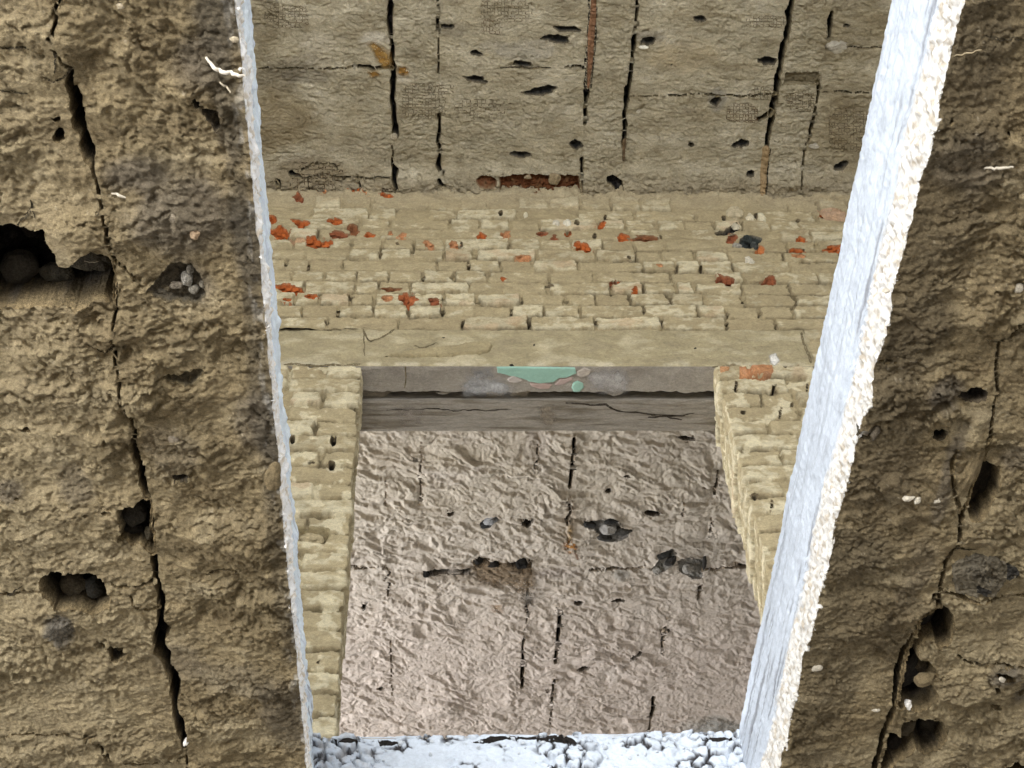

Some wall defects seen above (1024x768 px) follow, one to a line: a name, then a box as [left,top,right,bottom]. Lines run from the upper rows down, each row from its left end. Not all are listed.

spalling [474,172,582,193]
spalling [146,262,206,304]
crack [0,0,189,768]
crack [566,402,694,420]
spalling [583,518,632,542]
crack [871,324,1024,768]